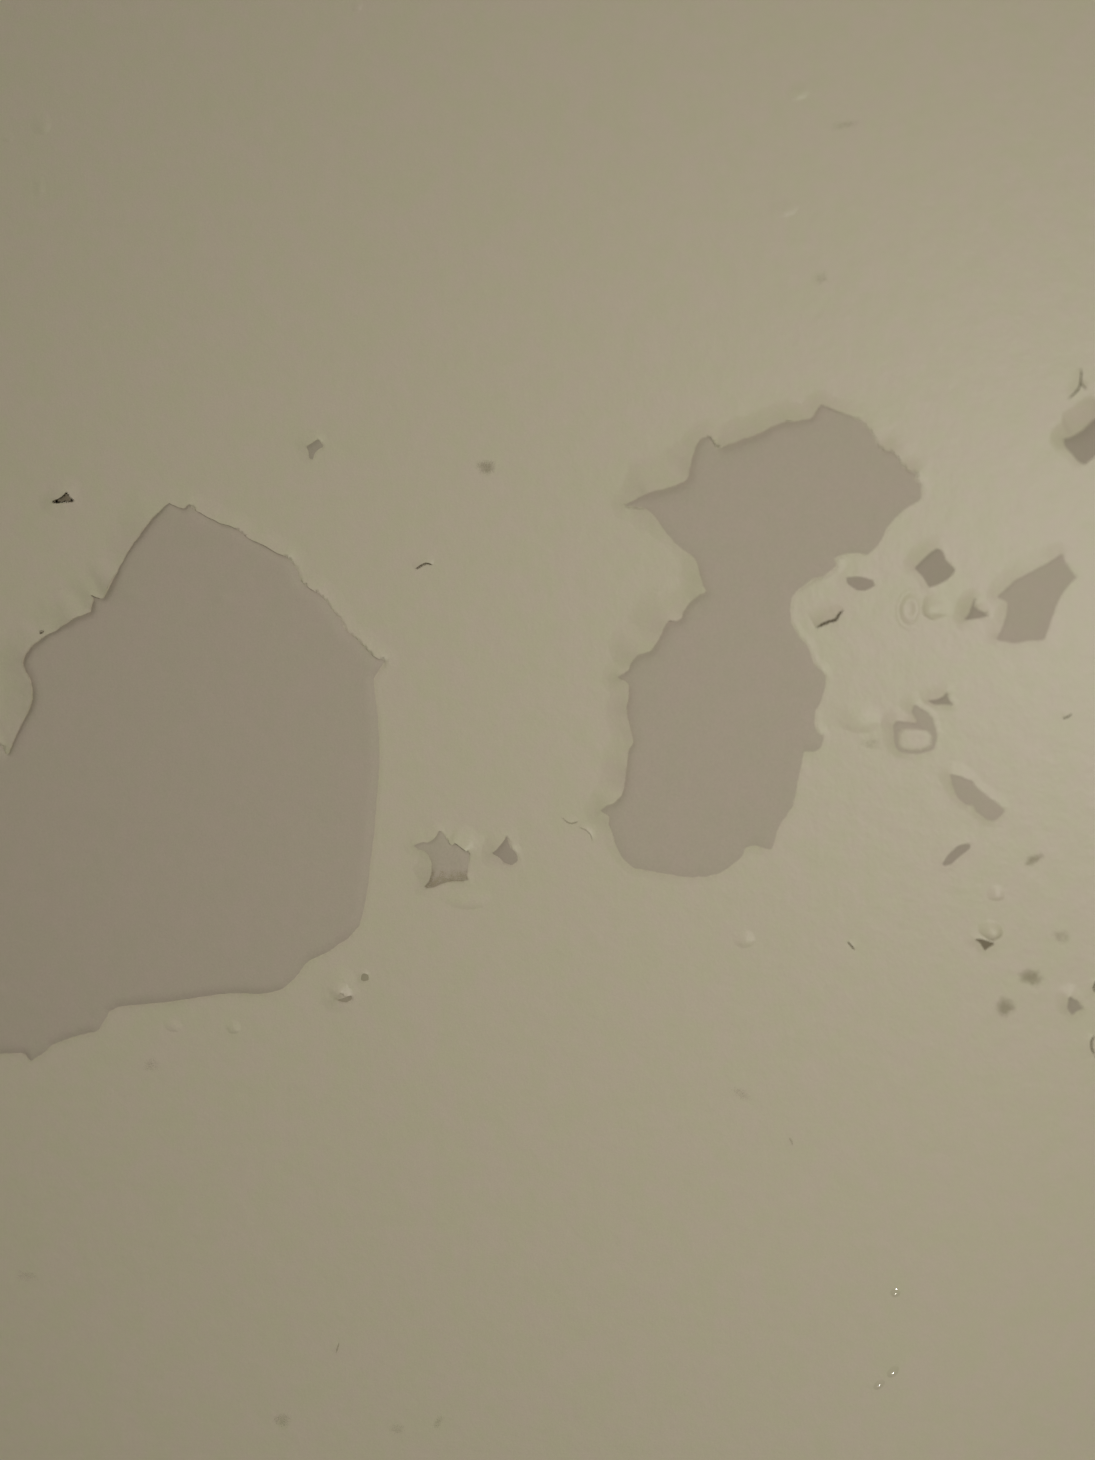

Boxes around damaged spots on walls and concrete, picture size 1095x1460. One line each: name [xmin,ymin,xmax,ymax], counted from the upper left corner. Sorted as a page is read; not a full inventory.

peeling [1049,395,1095,472]
peeling [902,534,1084,650]
peeling [402,817,525,897]